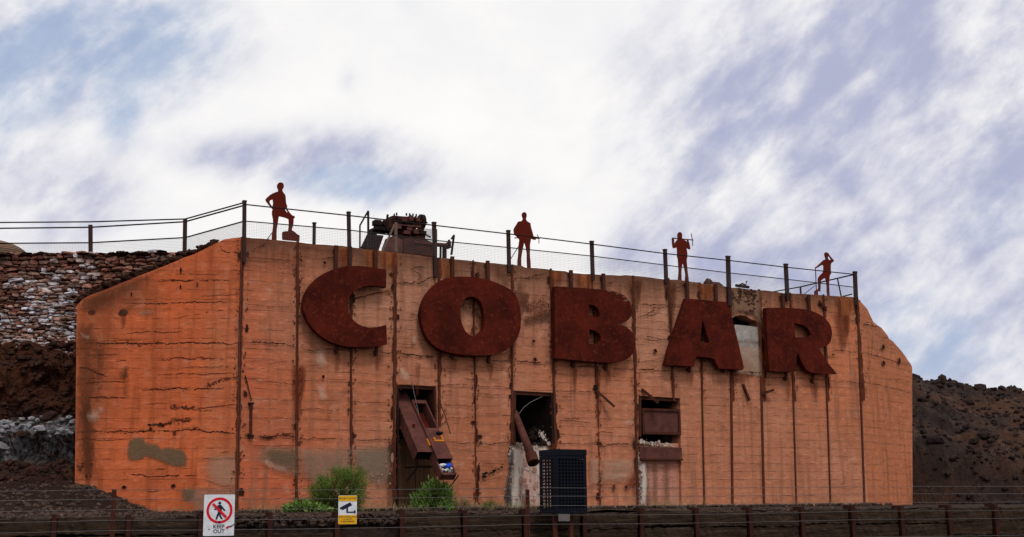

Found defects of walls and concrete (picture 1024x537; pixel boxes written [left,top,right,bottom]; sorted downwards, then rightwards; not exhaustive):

crack [77,238,390,492]
corrosion [294,367,304,411]
water stain [128,438,186,466]
peeling [513,452,551,507]